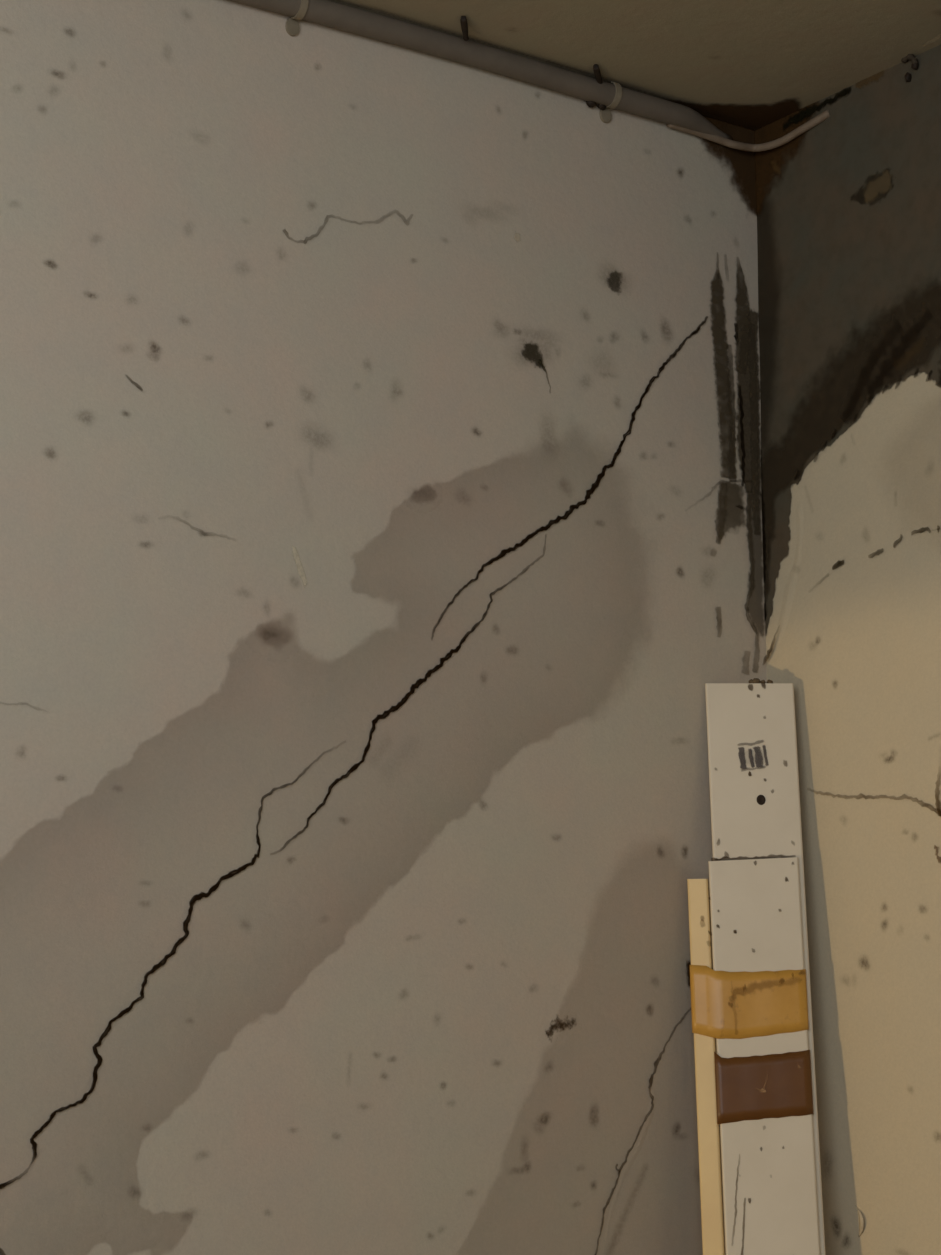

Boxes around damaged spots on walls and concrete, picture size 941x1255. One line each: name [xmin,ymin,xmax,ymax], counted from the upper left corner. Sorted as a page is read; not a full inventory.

damp [783,74,878,130]
damp [711,264,764,639]
peeling [757,44,941,636]
crack [832,526,940,570]
crack [0,316,708,1189]
crack [917,792,941,816]
crack [595,1015,685,1255]